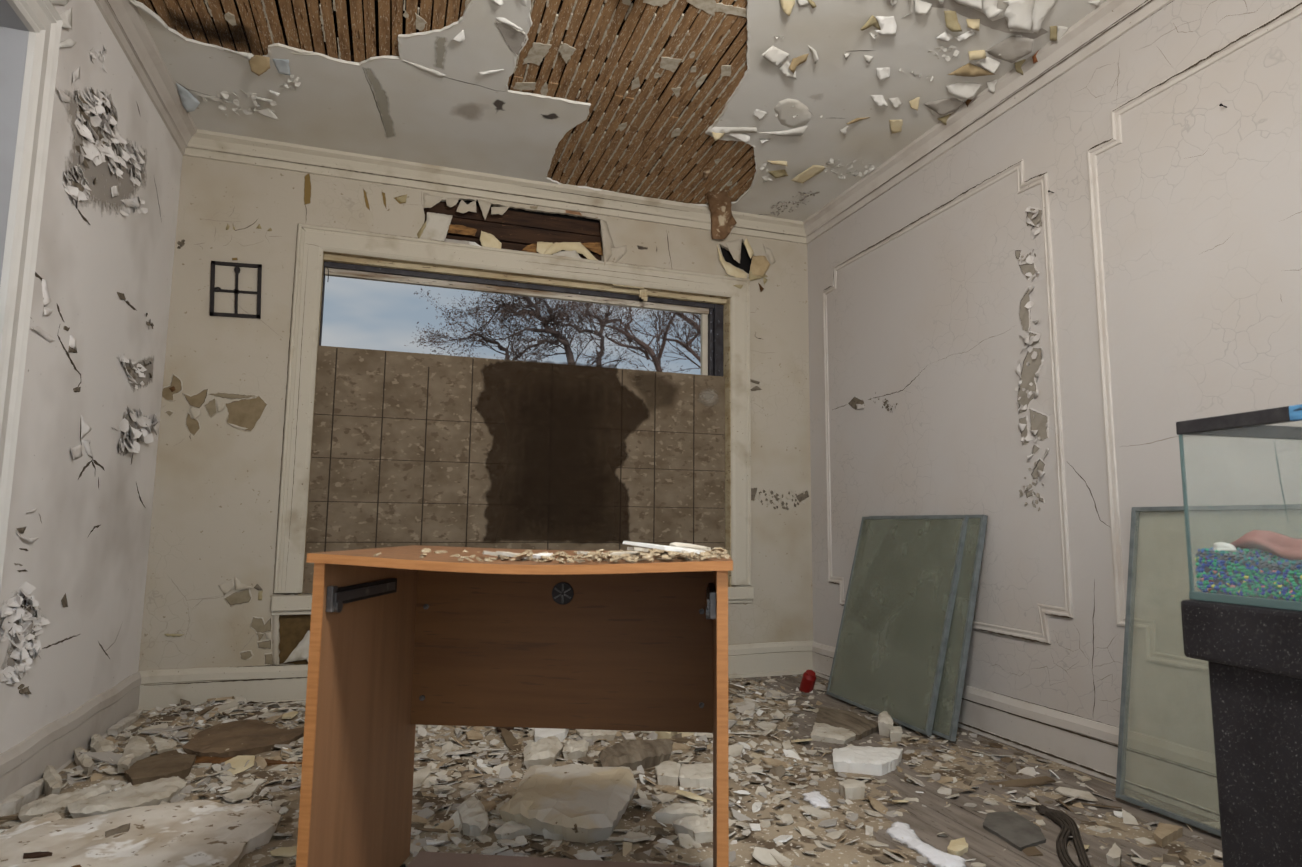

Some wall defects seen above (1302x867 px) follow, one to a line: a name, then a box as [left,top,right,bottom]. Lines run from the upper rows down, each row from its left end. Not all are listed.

peeling [57,45,148,225]
flaking render [134,0,475,120]
crack [107,0,708,284]
flaking render [478,0,875,216]
hole [720,243,752,274]
crack [824,161,1047,290]
peeling [840,0,1068,135]
crack [731,0,1302,242]
peeling [111,354,268,464]
damp [475,361,649,544]
crack [1068,463,1108,526]
peeling [0,508,80,694]